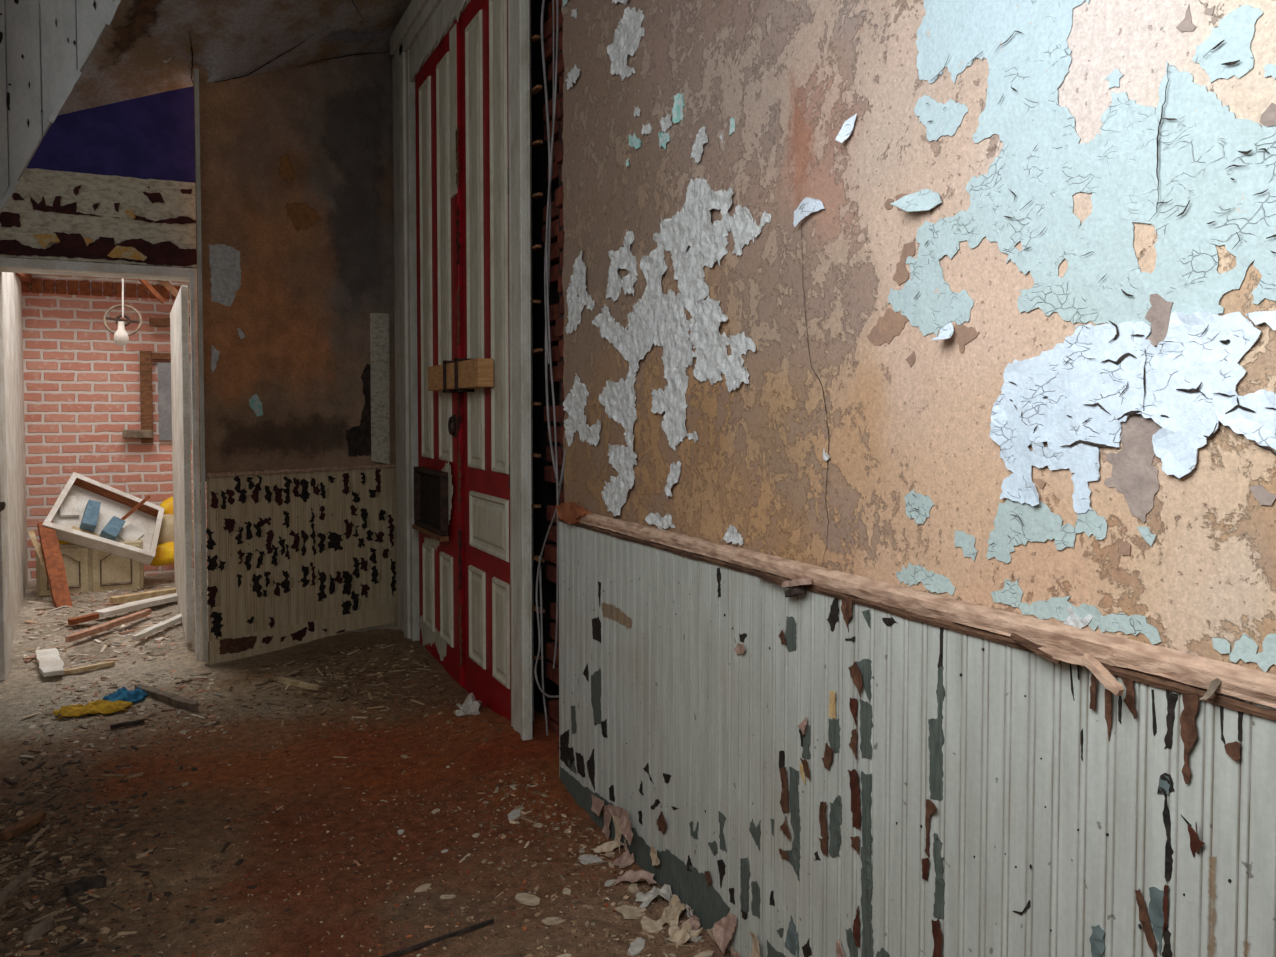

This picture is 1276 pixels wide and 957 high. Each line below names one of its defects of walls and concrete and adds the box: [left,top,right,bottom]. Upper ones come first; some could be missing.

crack [189,32,387,87]
peeling [200,364,396,654]
peeling [531,0,771,853]
crack [926,31,1023,122]
crack [1004,189,1046,250]
peeling [867,0,1276,523]
crack [1008,251,1276,456]
crack [1149,69,1276,254]
crack [1203,39,1240,65]
peeling [686,659,890,957]
peeling [920,627,945,957]
peeling [1135,678,1243,957]